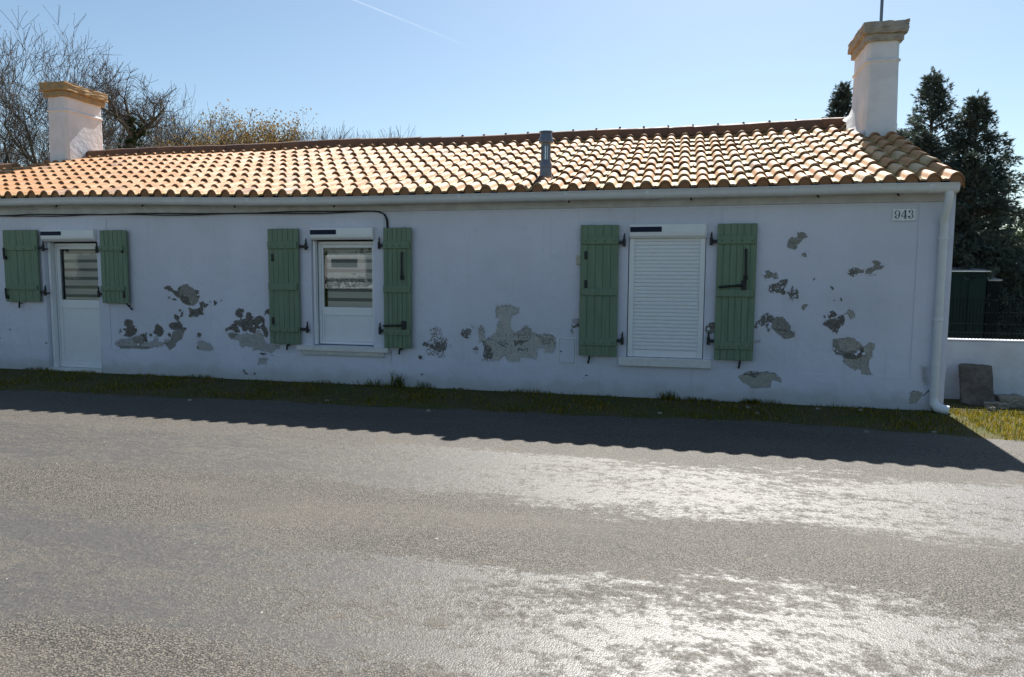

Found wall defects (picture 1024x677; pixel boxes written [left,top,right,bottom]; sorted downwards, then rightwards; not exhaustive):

peeling [787,231,809,257]
peeling [848,260,884,277]
peeling [762,270,807,310]
peeling [116,284,222,351]
peeling [225,308,279,375]
peeling [418,327,450,360]
peeling [461,305,556,362]
peeling [754,313,797,339]
peeling [823,286,874,375]
spalling [738,371,781,388]